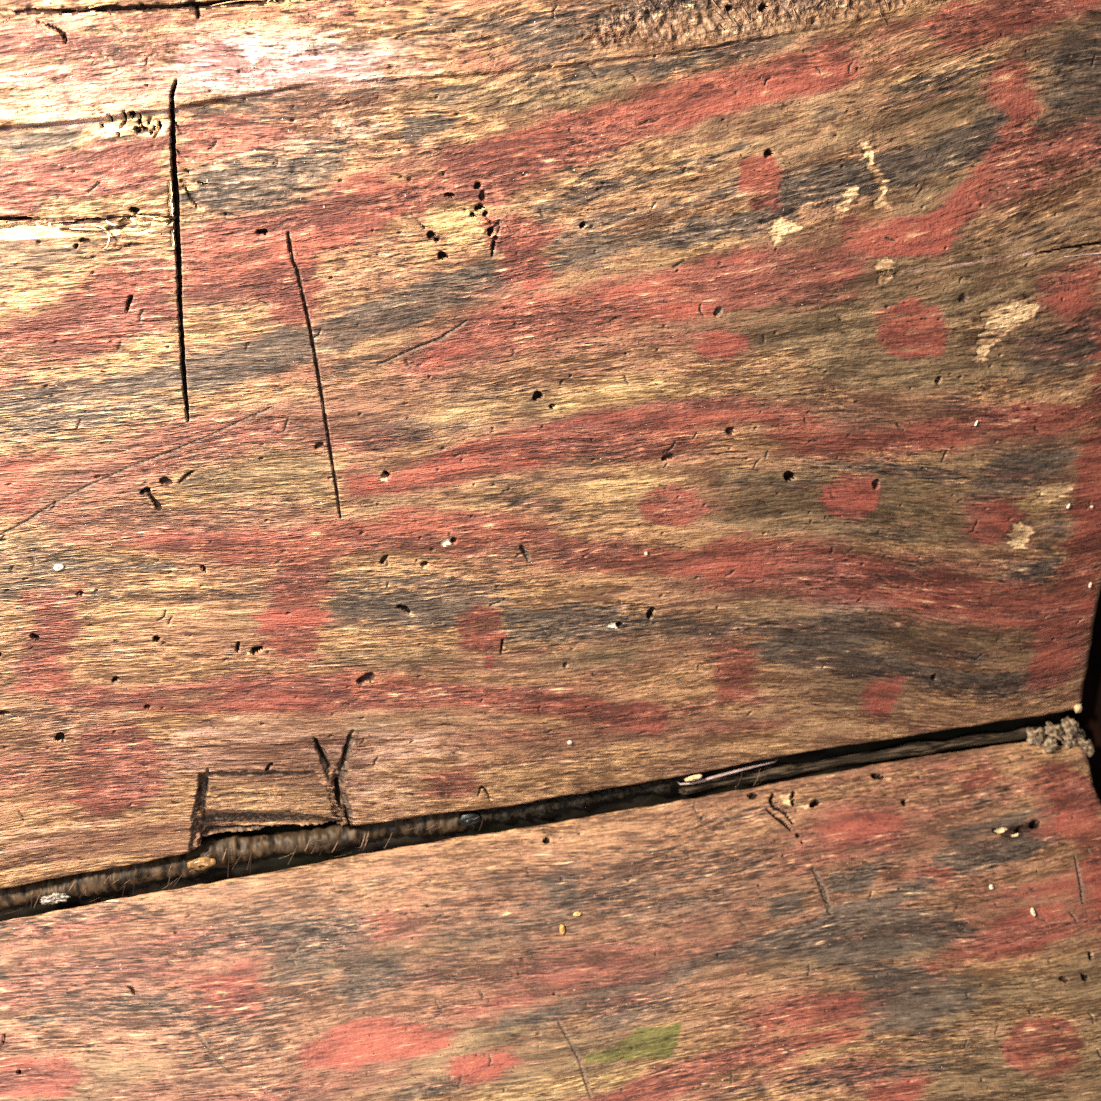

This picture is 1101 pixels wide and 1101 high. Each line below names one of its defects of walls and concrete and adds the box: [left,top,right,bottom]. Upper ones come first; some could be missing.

crack [0,0,318,43]